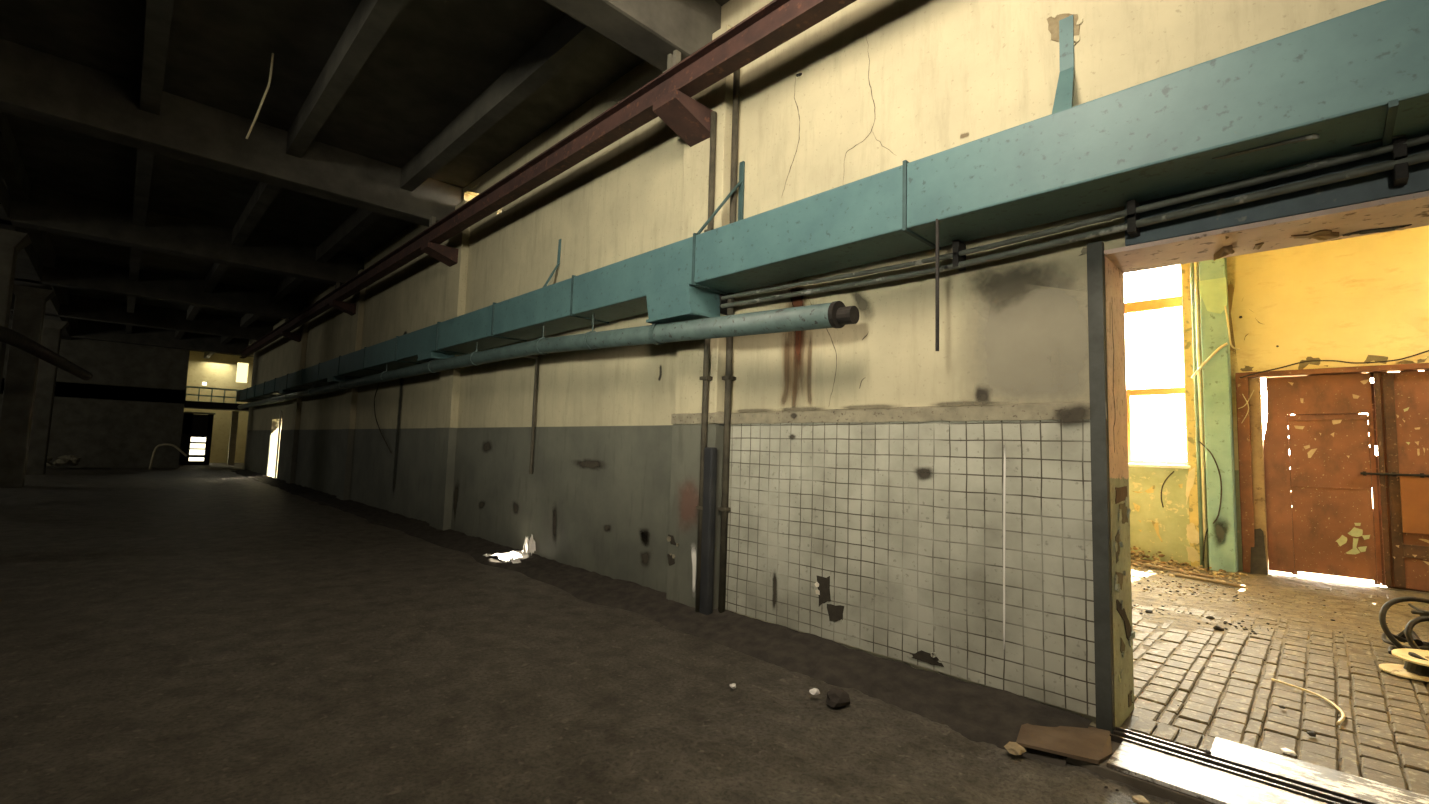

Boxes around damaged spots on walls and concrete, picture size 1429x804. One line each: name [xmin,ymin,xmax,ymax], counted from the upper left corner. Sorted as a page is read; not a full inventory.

flaking render [1047,12,1083,45]
crack [843,38,895,180]
crack [782,78,800,195]
rust [789,287,803,308]
water stain [982,266,1048,306]
rust [782,330,811,408]
peeling [1114,485,1162,658]
peeling [815,576,844,623]
peeling [908,650,944,667]